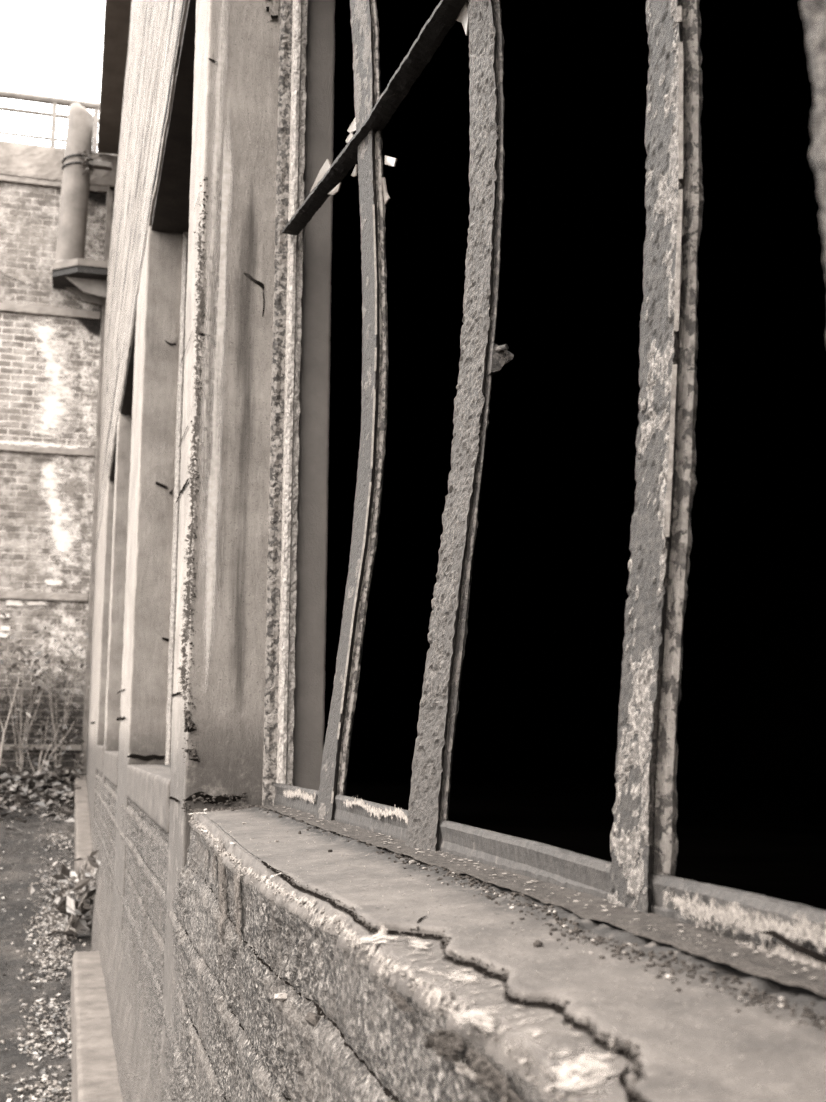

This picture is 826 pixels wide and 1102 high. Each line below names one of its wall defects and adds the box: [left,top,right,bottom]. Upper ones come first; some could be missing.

crack [261,861,652,1102]